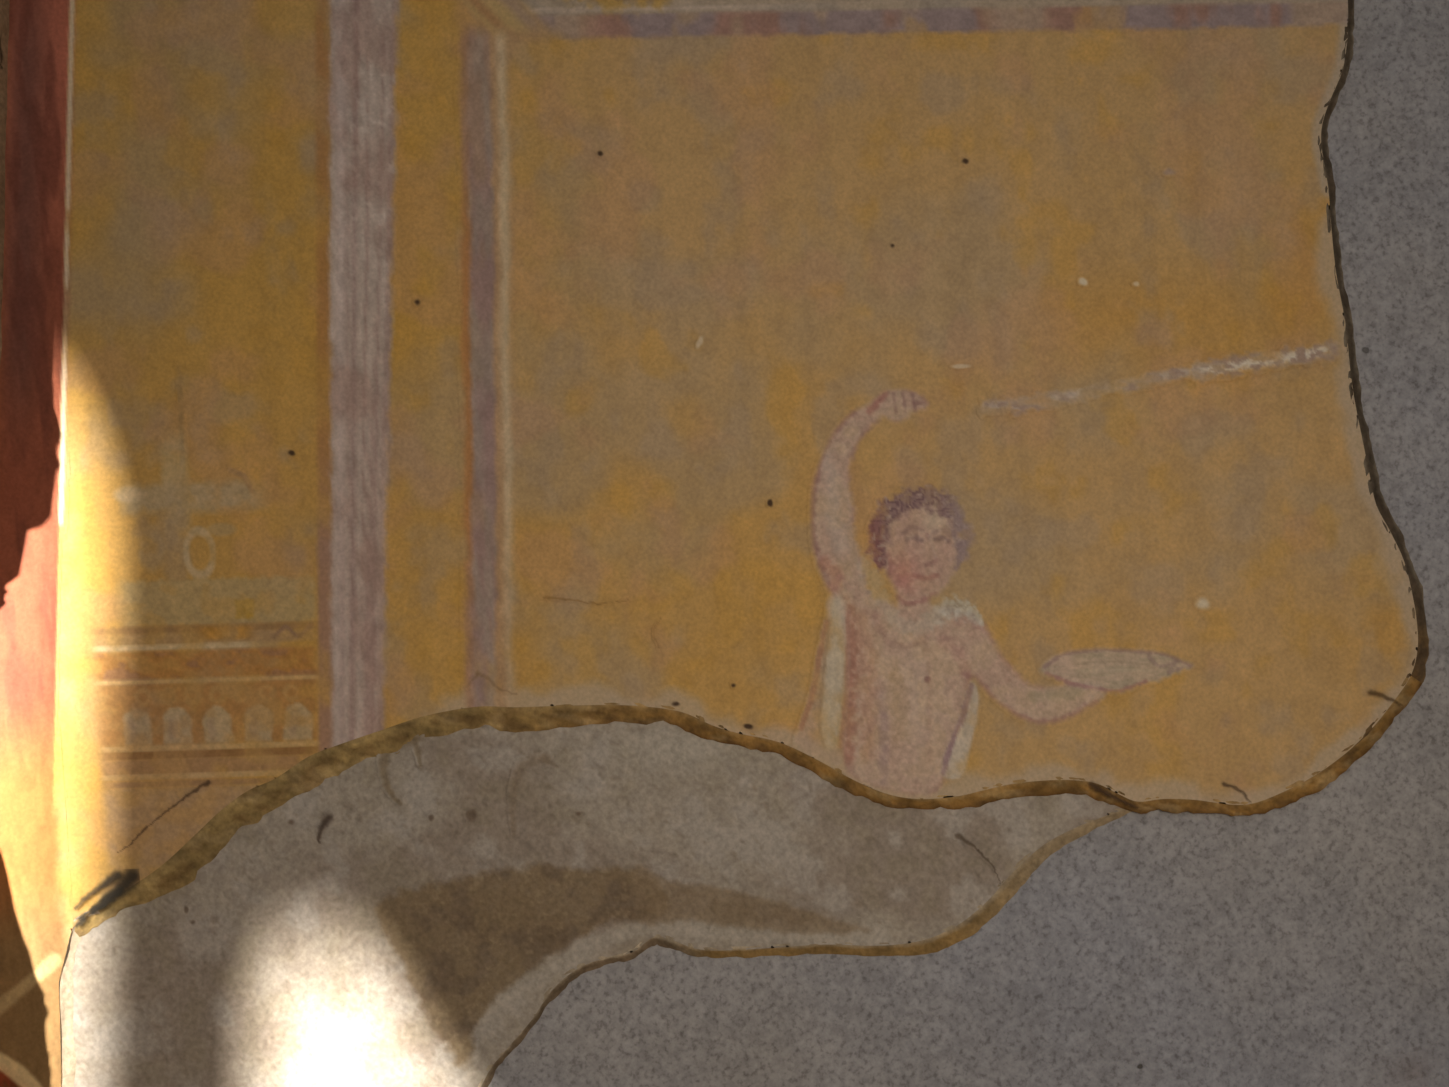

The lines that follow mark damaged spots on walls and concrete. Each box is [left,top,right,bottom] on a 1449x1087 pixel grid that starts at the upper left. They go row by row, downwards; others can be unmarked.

peeling [553,0,675,21]
peeling [977,0,1429,683]
flaking render [59,673,1422,1087]